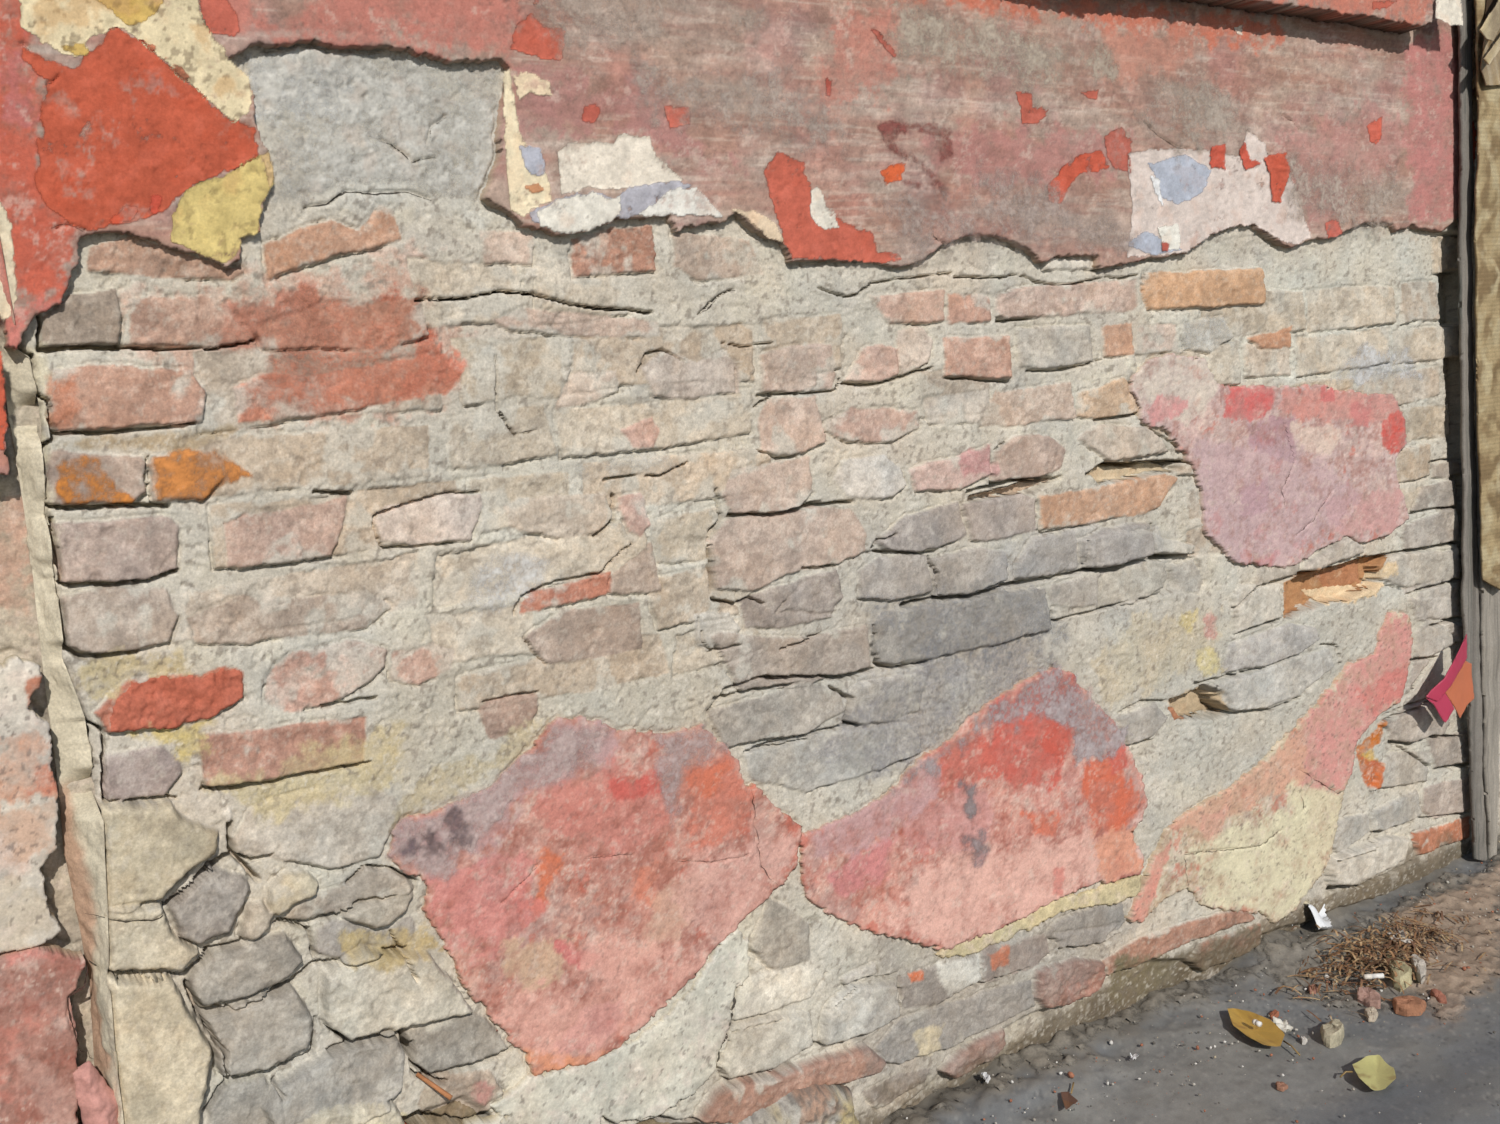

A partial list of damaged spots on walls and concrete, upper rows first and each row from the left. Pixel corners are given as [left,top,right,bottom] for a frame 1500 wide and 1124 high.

peeling [19,0,901,263]
peeling [881,163,905,184]
peeling [1016,91,1048,124]
peeling [1047,127,1342,258]
peeling [0,202,17,319]
crack [414,291,650,313]
peeling [0,351,8,450]
spalling [967,478,1049,501]
peeling [1085,353,1409,618]
spalling [110,668,243,732]
peeling [0,655,61,953]
peeling [387,611,1413,1124]